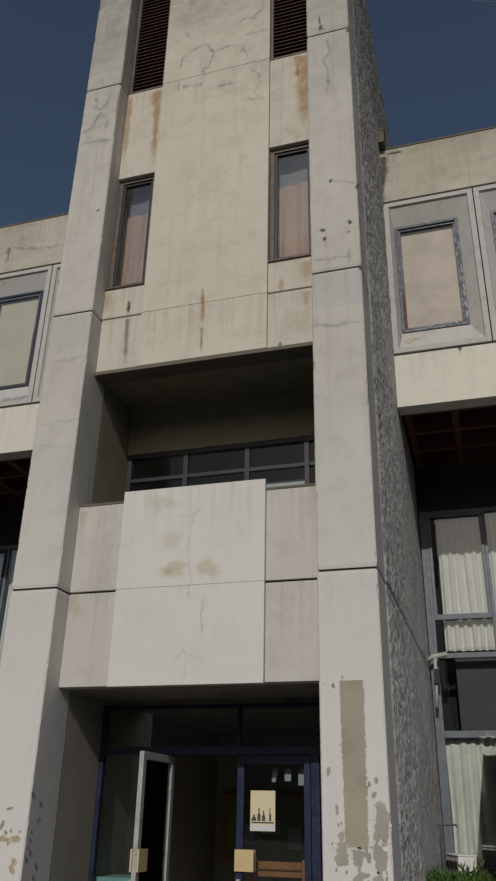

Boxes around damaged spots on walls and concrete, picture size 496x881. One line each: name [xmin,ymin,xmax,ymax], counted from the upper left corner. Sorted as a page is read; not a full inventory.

peeling [0,792,42,880]
peeling [326,675,392,881]